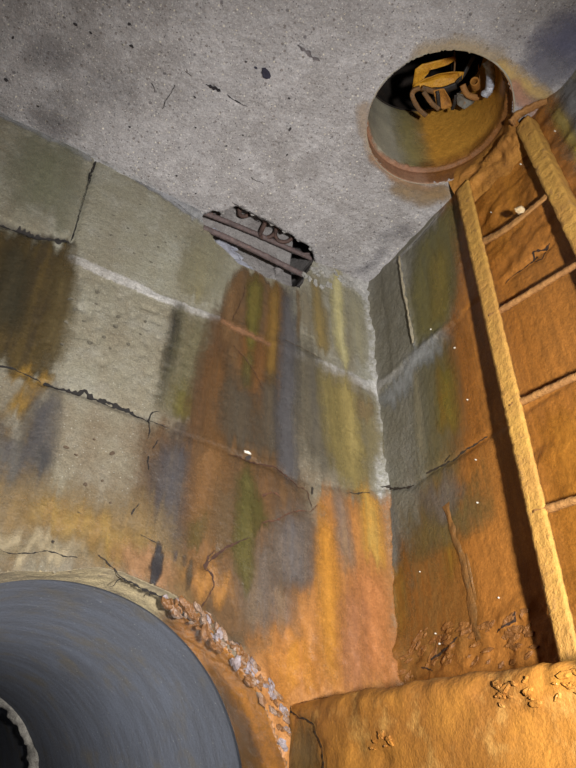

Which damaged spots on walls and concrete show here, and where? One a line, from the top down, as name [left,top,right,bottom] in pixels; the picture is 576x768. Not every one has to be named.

crack [0,161,96,244]
spalling [202,206,354,290]
crack [505,243,550,284]
water stain [0,231,74,380]
crack [0,365,167,470]
rust [164,42,576,768]
crack [350,436,488,494]
crack [0,540,78,558]
crack [98,538,248,619]
peeling [160,594,292,752]
spalling [397,608,540,683]
crack [290,707,324,768]